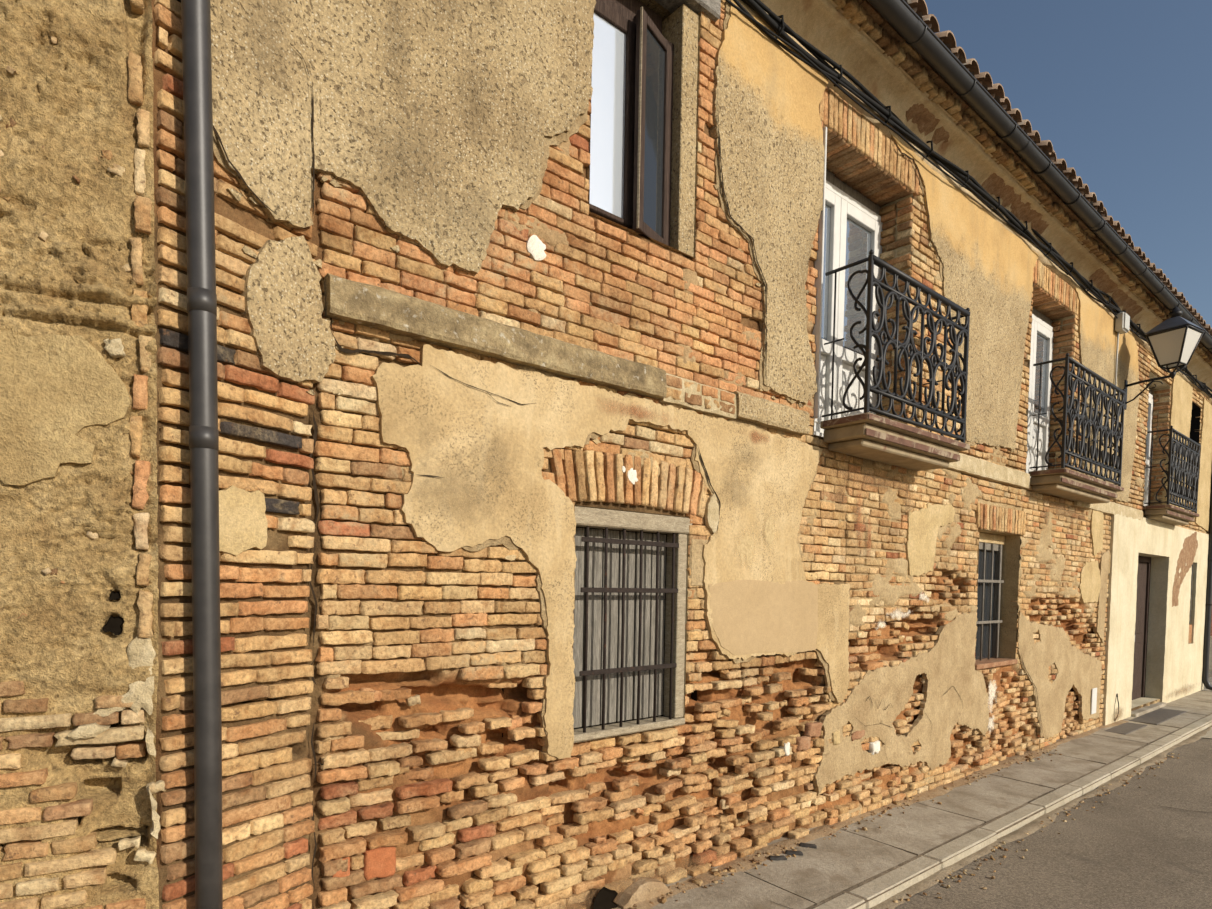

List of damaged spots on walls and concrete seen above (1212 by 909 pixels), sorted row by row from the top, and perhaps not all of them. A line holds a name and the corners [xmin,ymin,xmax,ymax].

peeling [210,0,596,395]
peeling [316,344,1109,865]
peeling [1074,287,1140,503]
peeling [1162,369,1212,607]
spalling [54,723,156,769]
spalling [118,780,167,865]